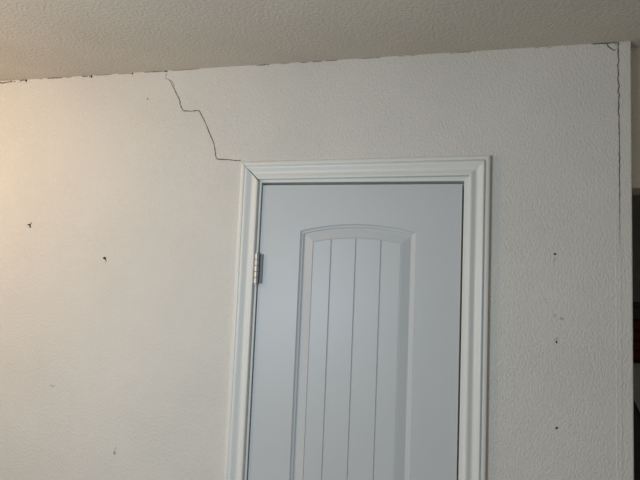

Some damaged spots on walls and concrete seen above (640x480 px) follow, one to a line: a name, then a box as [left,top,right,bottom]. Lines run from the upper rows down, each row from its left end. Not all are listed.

crack [128,69,241,161]
crack [594,42,624,212]